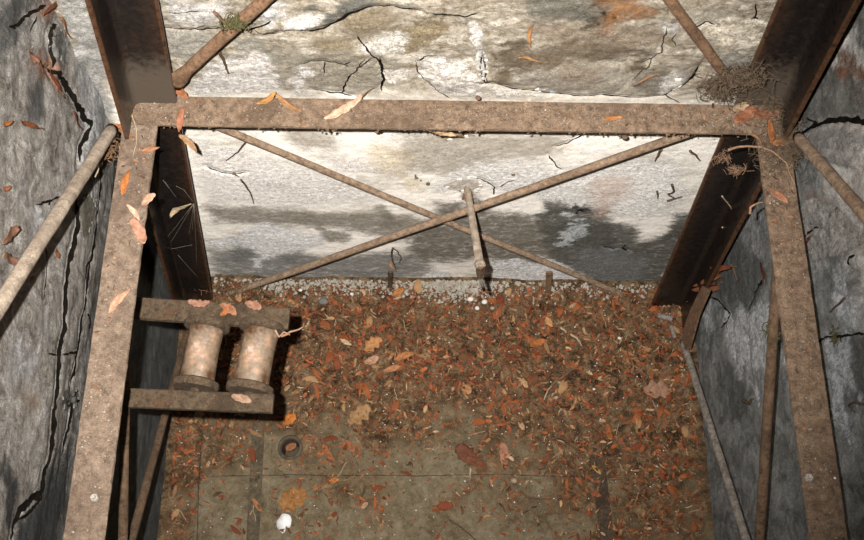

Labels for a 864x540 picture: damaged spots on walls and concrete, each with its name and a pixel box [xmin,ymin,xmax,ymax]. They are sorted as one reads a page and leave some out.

crack [9,4,93,161]
water stain [164,0,228,59]
crack [242,5,479,99]
water stain [189,0,686,99]
crack [479,28,699,103]
crack [802,116,864,133]
rust [833,50,864,98]
water stain [191,130,694,281]
crack [10,172,102,540]